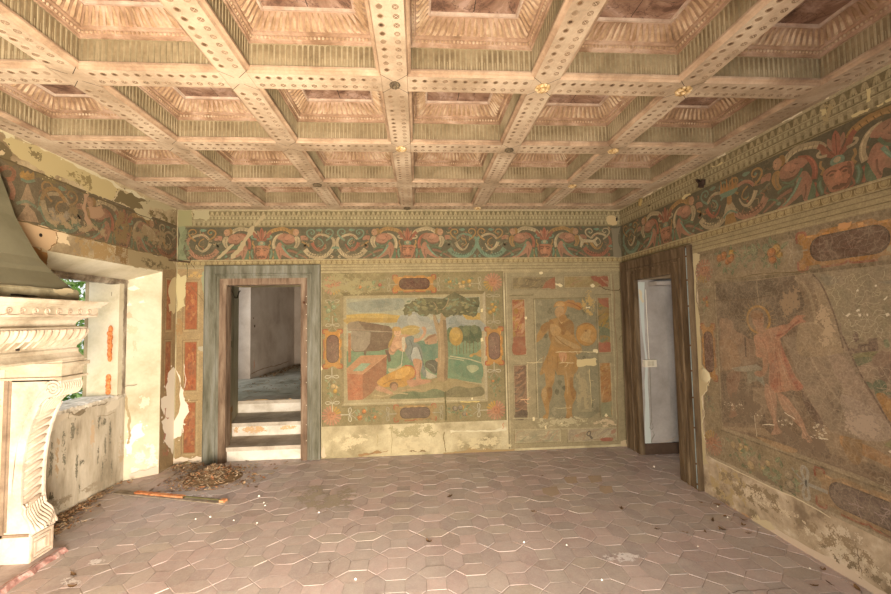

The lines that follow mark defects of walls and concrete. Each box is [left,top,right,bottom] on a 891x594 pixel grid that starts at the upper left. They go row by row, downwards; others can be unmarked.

flaking render [0,129,176,314]
flaking render [124,421,148,456]
flaking render [161,365,202,464]
crack [701,380,885,572]
flaking render [751,515,887,594]